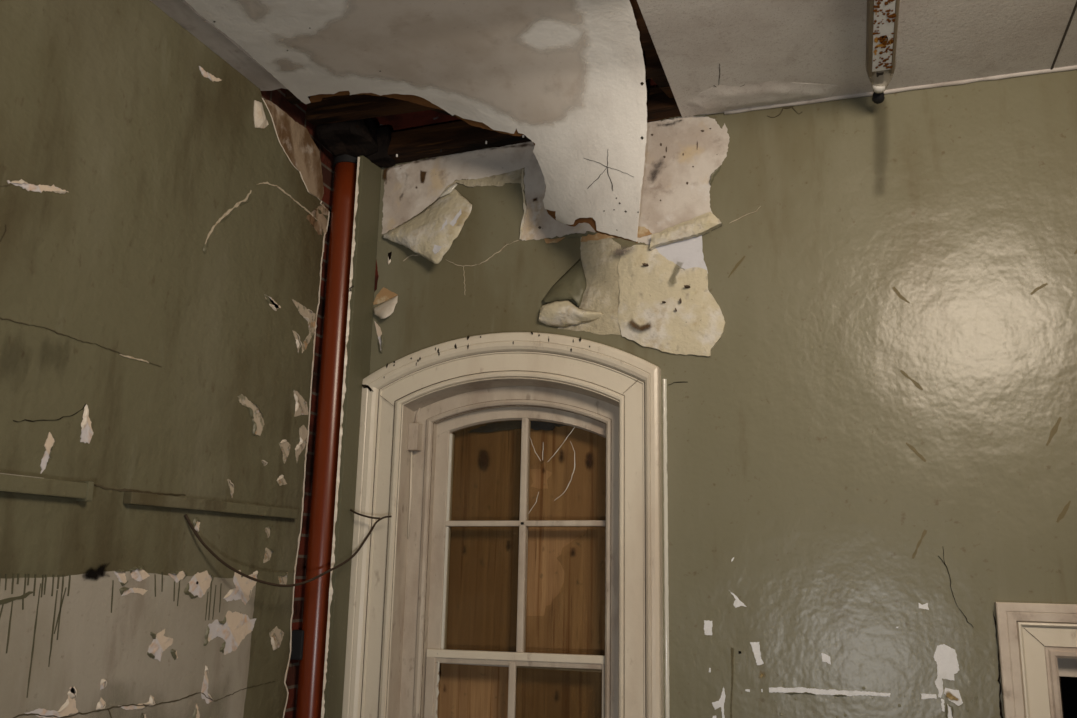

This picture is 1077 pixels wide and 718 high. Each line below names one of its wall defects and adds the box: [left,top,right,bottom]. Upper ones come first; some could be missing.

damp [278,0,587,124]
corrosion [872,0,896,69]
peeling [7,179,68,194]
peeling [382,115,730,357]
crack [0,317,161,367]
peeling [40,432,56,474]
peeling [80,404,93,444]
flaking render [254,97,330,718]
peeling [0,526,274,718]
crack [13,681,275,718]
peeling [745,687,890,697]
peeling [920,644,963,718]